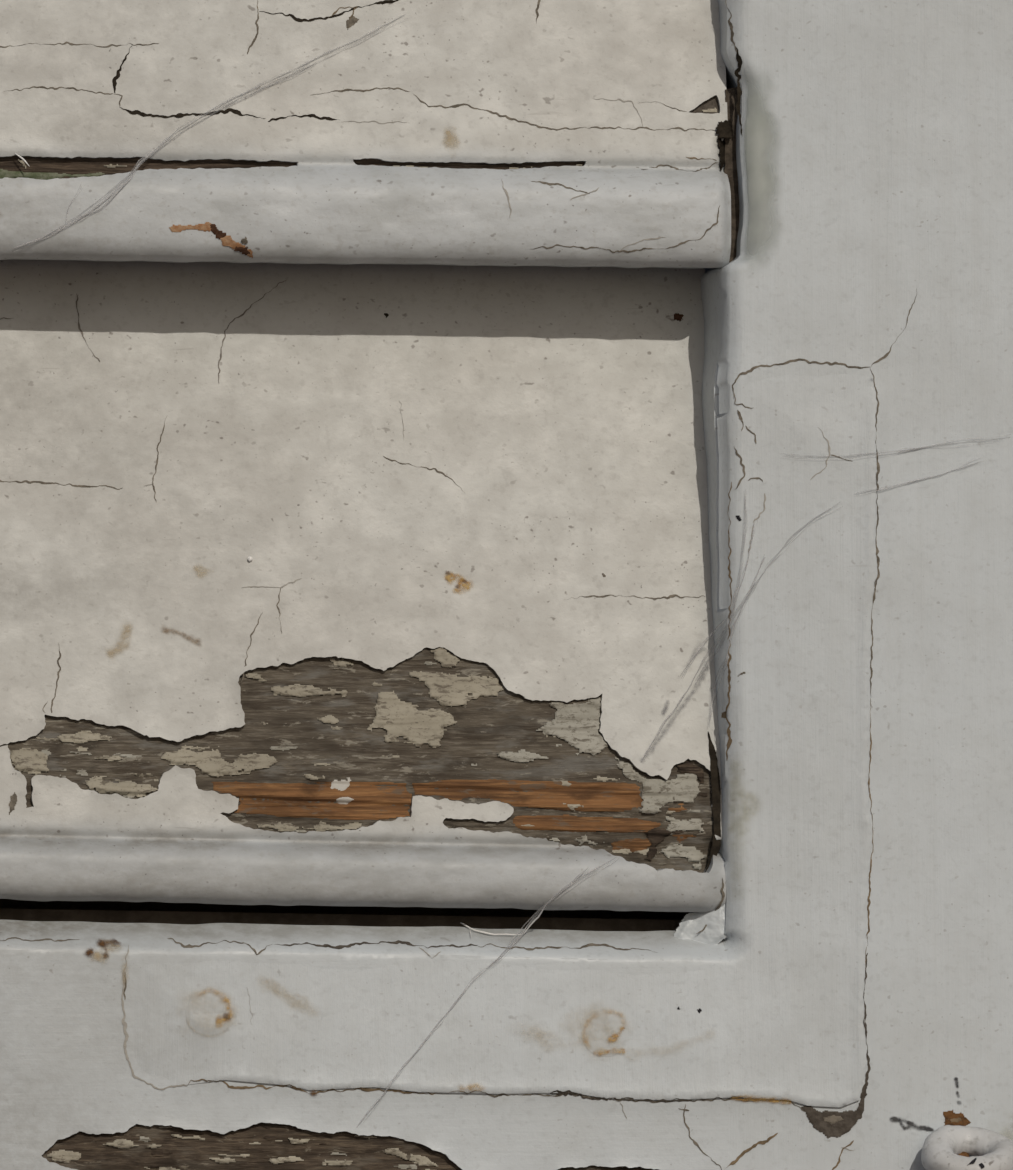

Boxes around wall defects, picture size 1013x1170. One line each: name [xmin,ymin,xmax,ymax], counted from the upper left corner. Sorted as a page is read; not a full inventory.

crack [0,0,743,172]
peeling [169,222,253,258]
crack [0,415,168,500]
crack [569,295,917,1103]
peeling [8,647,714,873]
crack [0,935,80,943]
crack [168,938,658,958]
crack [121,945,806,1170]
peeling [41,1122,461,1170]